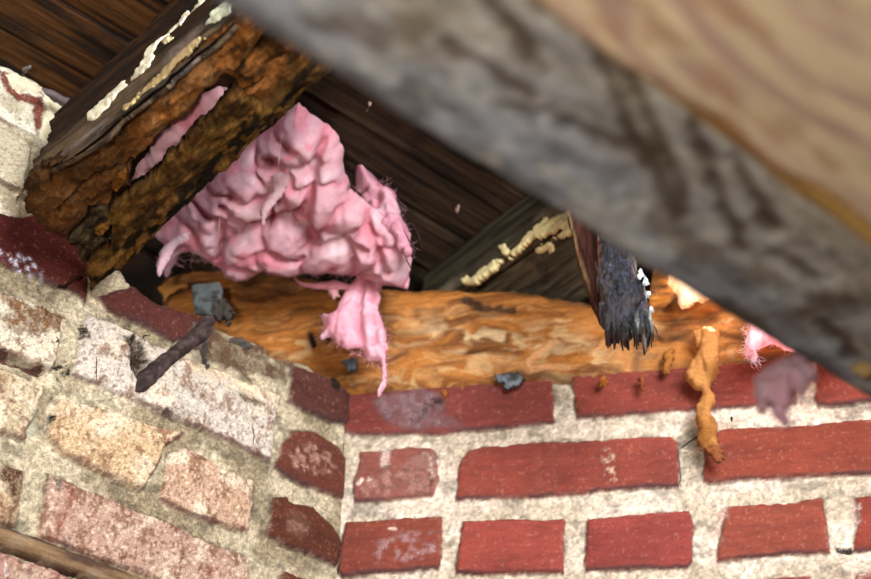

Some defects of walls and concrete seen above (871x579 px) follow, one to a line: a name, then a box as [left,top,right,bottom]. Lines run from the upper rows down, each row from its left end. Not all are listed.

spalling [87,0,206,121]
peeling [205,4,231,25]